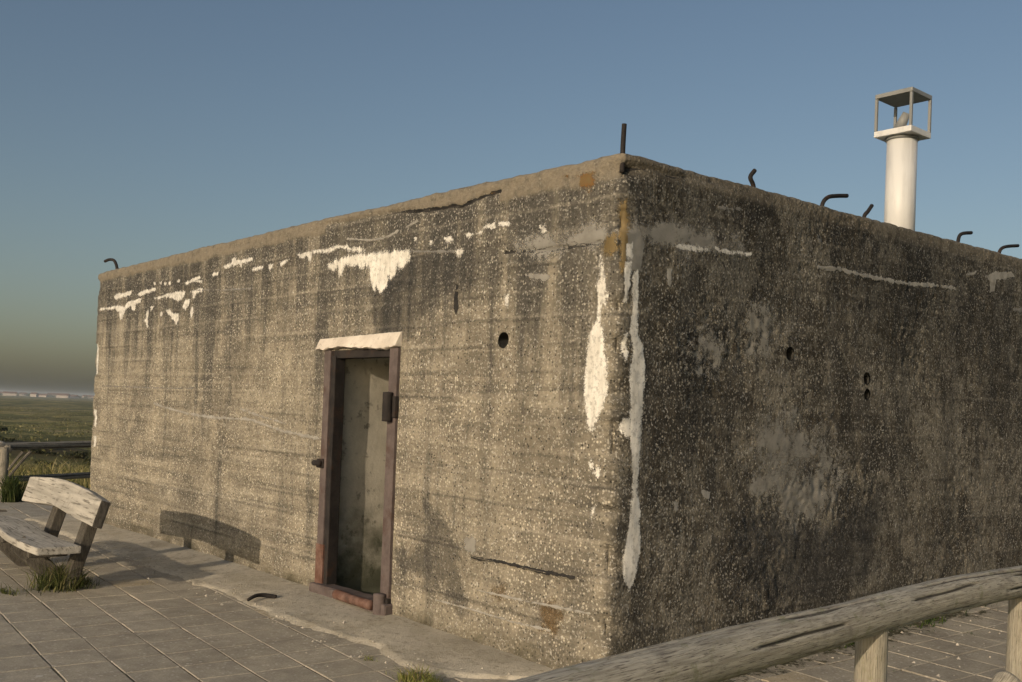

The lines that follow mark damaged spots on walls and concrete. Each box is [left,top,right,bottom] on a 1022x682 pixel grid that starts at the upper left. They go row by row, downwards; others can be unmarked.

crack [379,189,502,217]
rust [603,199,629,273]
efflorescence [513,218,716,593]
crack [471,556,575,579]